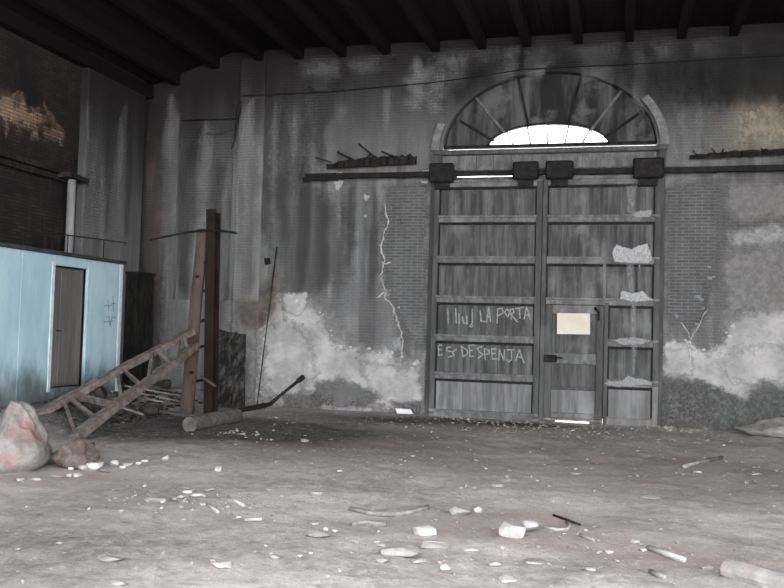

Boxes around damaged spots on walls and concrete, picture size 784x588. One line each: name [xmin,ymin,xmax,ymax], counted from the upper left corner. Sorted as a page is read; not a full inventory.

flaking render [0,93,64,146]
damp [632,210,652,218]
damp [725,182,784,246]
crack [377,207,404,356]
damp [612,244,652,263]
peeling [255,290,424,412]
crack [680,309,708,369]
peeling [663,244,784,401]
damp [662,379,784,431]